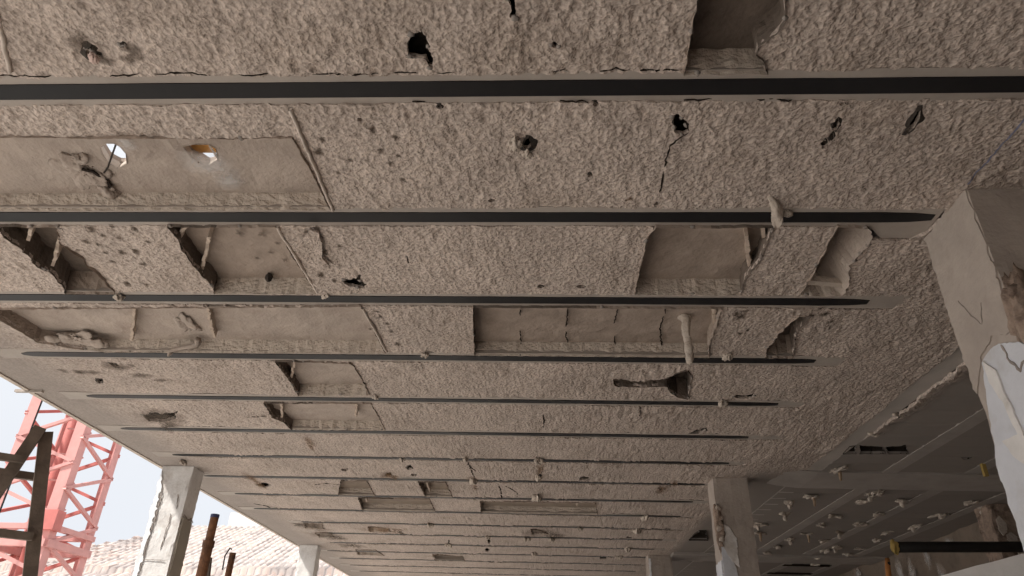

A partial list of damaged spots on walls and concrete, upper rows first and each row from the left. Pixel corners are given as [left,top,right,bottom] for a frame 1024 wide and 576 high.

crack [659,136,683,193]
spalling [0,190,1024,550]